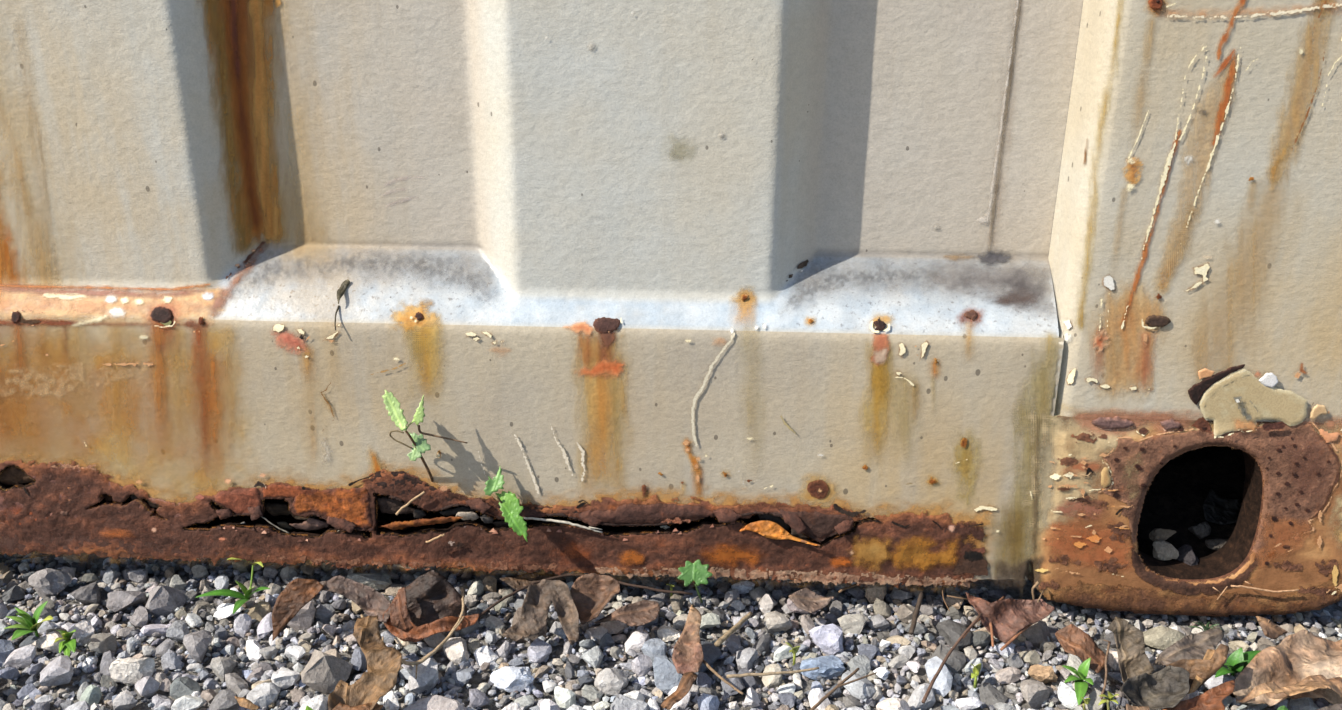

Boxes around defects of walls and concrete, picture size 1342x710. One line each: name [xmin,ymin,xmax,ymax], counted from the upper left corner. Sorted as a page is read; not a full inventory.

corrosion [1270,0,1332,182]
corrosion [0,0,991,588]
corrosion [1023,286,1342,617]
peeling [1188,363,1330,438]